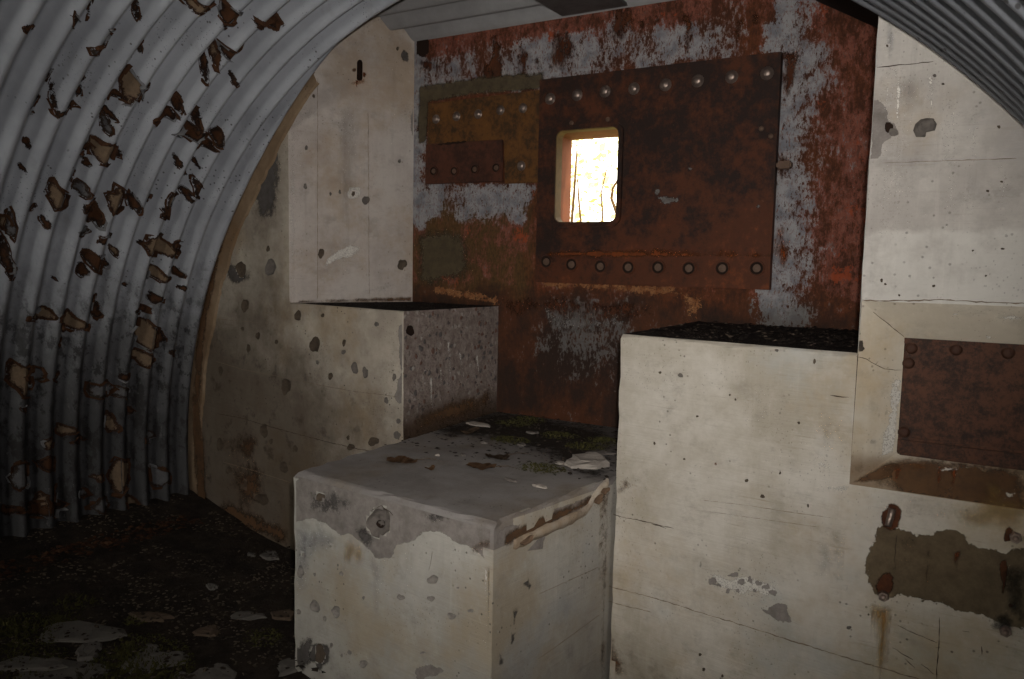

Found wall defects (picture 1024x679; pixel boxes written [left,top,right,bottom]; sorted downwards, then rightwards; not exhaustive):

peeling [179,0,217,16]
rust [610,7,660,40]
peeling [118,64,151,107]
rust [483,35,503,78]
rust [517,31,575,74]
rust [782,52,799,95]
peeling [86,110,119,168]
peeling [44,169,128,216]
peeling [140,232,182,284]
rust [538,282,702,319]
peeling [280,452,610,559]
rust [881,504,902,530]